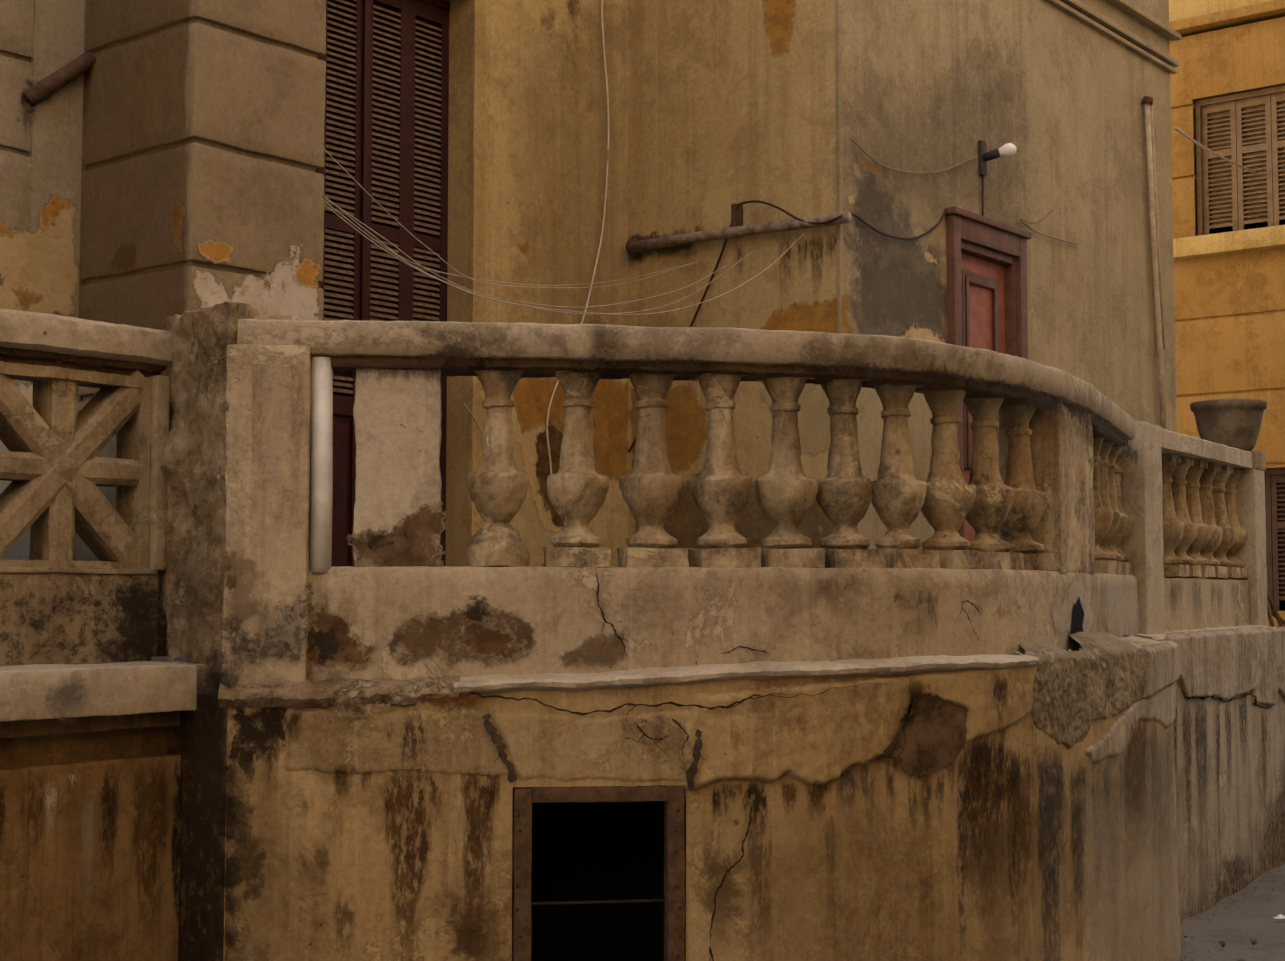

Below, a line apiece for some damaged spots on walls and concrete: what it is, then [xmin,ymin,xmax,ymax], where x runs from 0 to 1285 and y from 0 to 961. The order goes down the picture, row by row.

peeling [0,194,79,316]
peeling [761,295,857,334]
spalling [158,239,322,681]
peeling [509,377,566,567]
crack [558,568,631,668]
crack [720,644,771,656]
water stain [0,577,315,961]
water stain [384,776,441,918]
water stain [462,776,499,900]
crack [469,683,891,788]
crack [709,801,753,961]
water stain [908,678,1085,961]